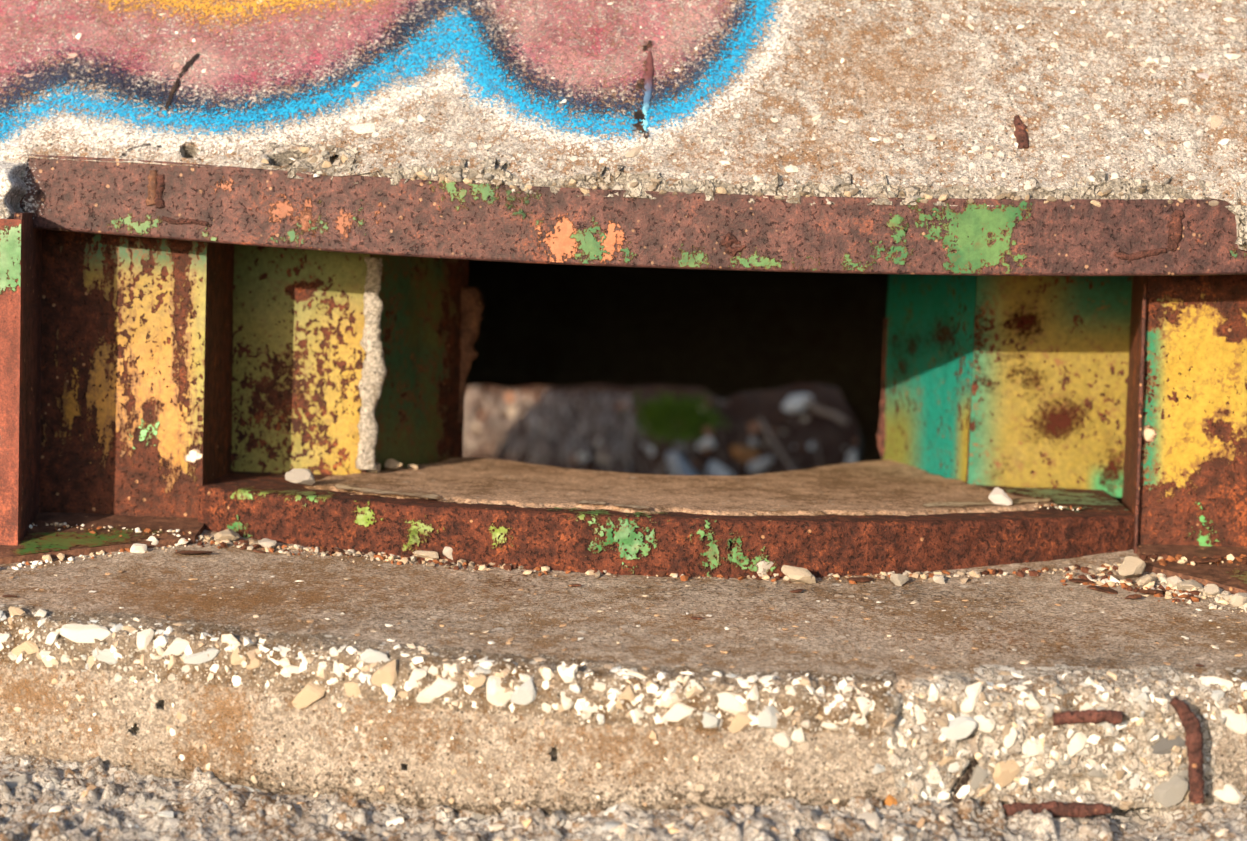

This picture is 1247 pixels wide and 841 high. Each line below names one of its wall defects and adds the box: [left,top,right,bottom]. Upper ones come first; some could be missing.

spalling [635,26,664,144]
peeling [962,0,1158,68]
spalling [176,134,203,160]
peeling [213,175,236,199]
peeling [41,208,219,498]
peeling [226,194,465,538]
peeling [249,115,1247,550]
peeling [9,525,164,593]
peeling [401,515,445,558]
peeling [547,507,673,576]
peeling [627,518,778,620]
spalling [0,565,1247,818]